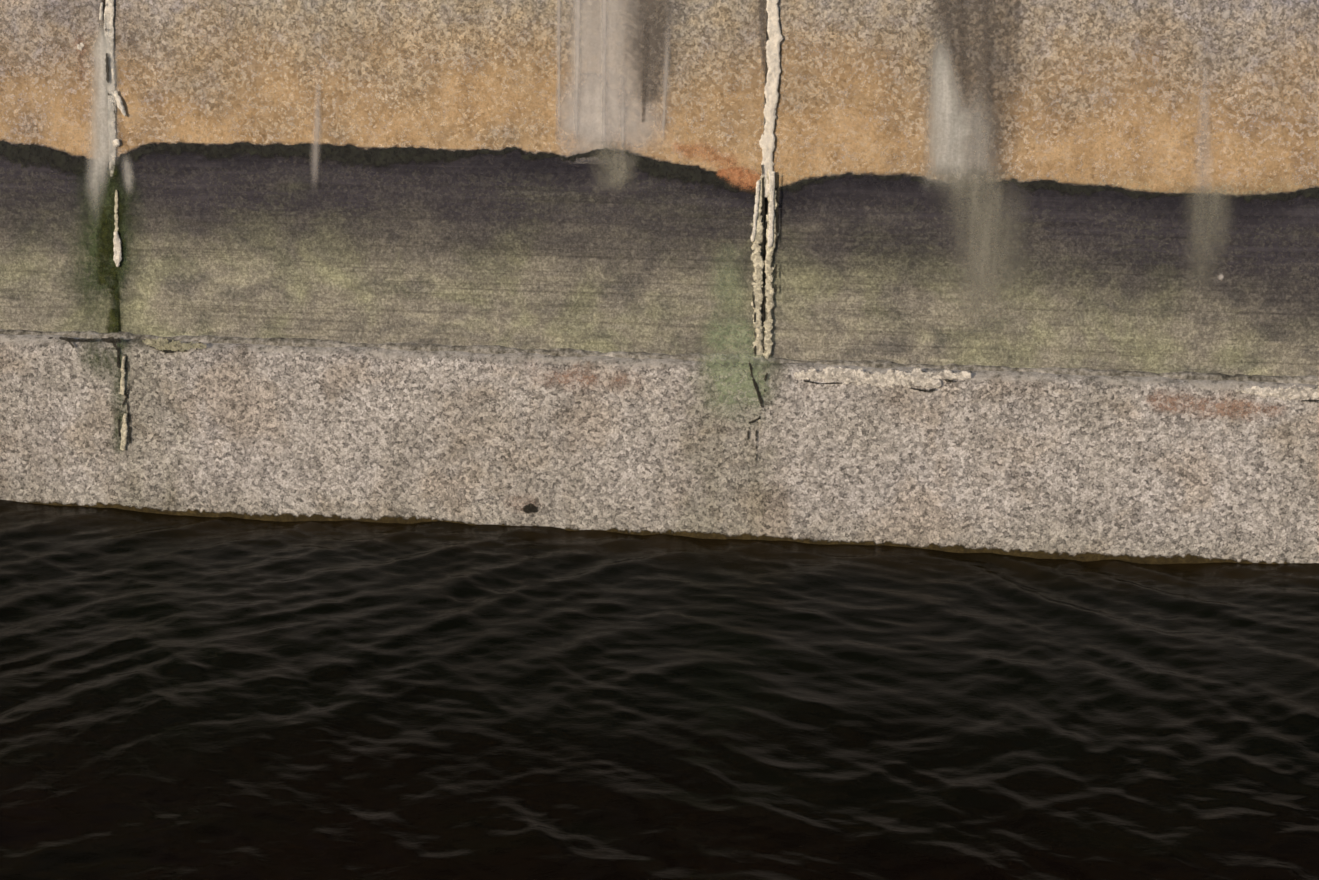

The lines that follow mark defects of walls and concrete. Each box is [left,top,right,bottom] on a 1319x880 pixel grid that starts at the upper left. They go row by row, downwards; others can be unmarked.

water stain [0,0,1319,359]
crack [48,336,131,451]